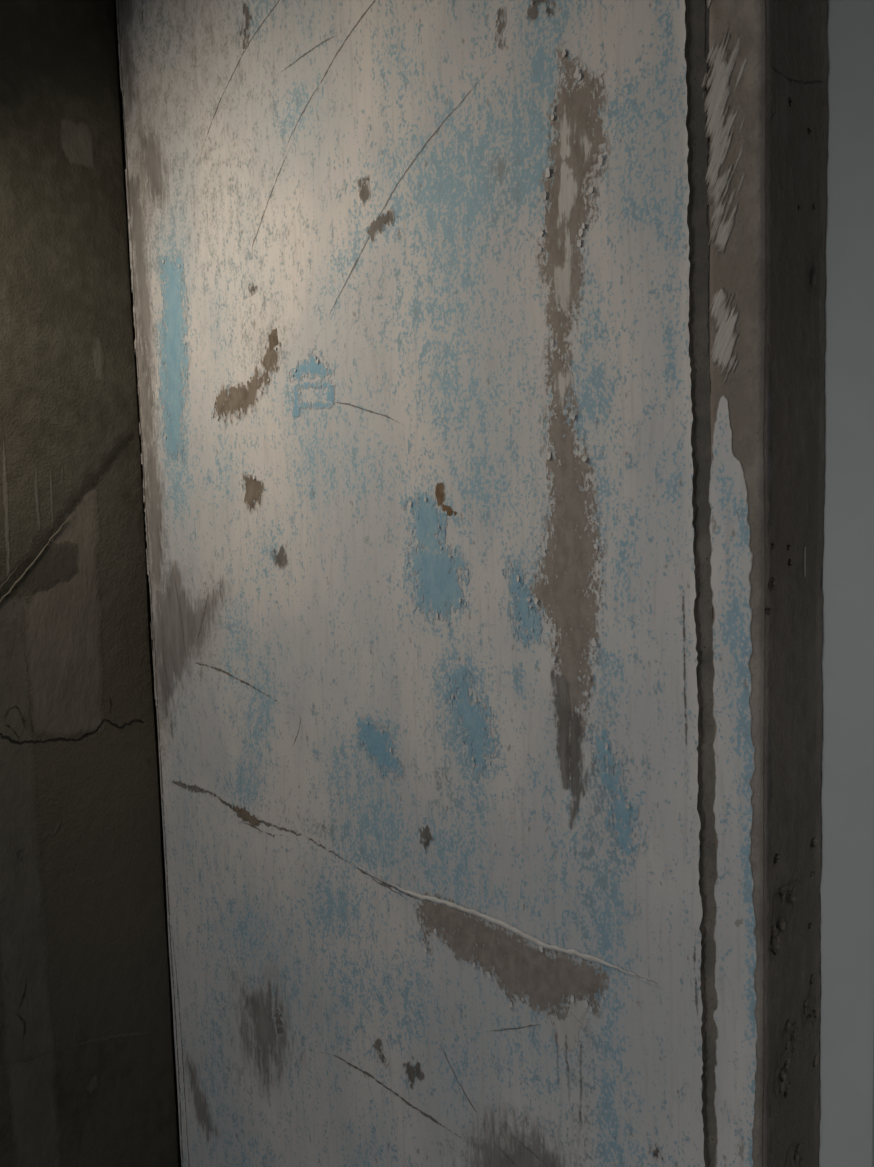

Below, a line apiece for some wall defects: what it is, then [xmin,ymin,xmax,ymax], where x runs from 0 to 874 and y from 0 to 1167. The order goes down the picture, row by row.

peeling [491,6,506,51]
spalling [521,0,559,25]
flaking render [502,40,611,829]
crack [0,1,403,1167]
flaking render [412,890,610,1089]